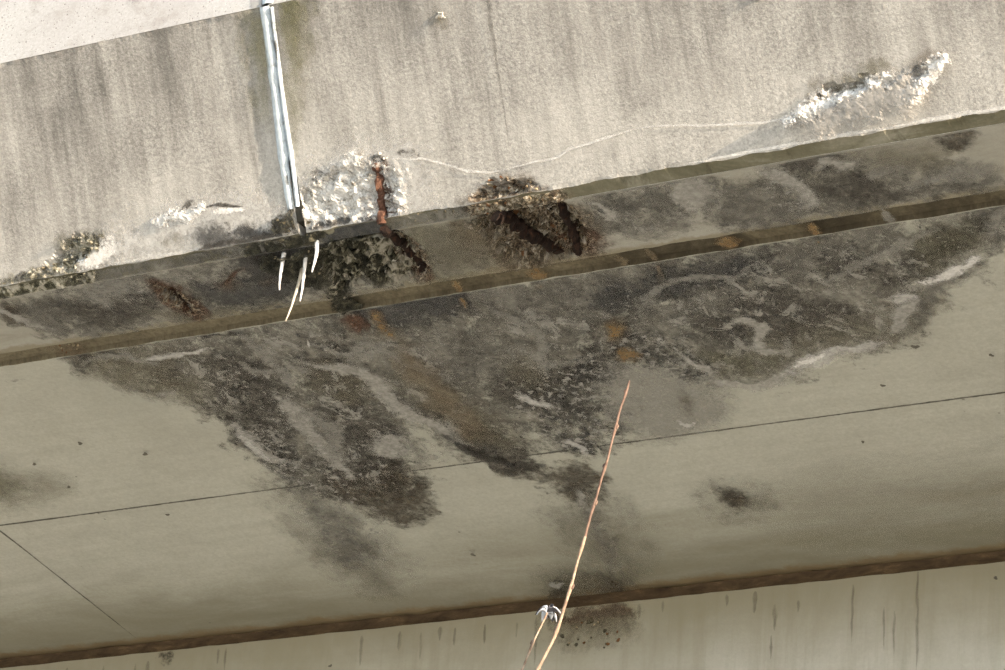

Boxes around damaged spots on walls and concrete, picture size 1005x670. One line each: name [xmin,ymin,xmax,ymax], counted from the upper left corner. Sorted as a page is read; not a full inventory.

spalling [0,233,137,299]
leakage [0,192,331,339]
corrosion [144,279,211,320]
spalling [301,141,605,313]
crack [392,119,781,173]
leakage [586,131,1002,239]
leakage [689,106,1005,164]
leakage [64,206,1005,598]